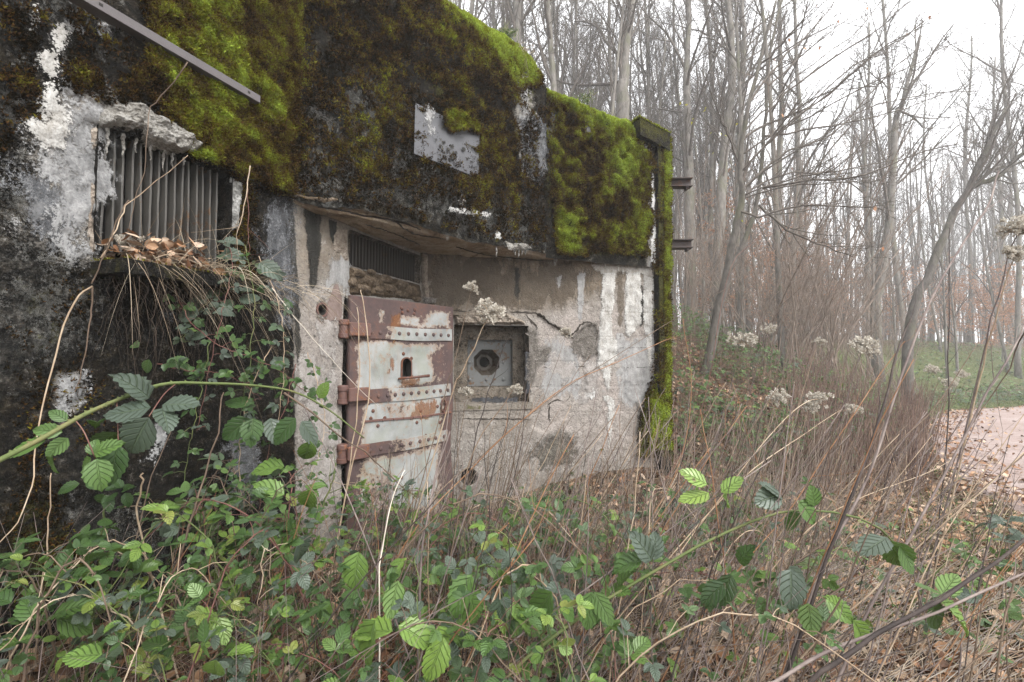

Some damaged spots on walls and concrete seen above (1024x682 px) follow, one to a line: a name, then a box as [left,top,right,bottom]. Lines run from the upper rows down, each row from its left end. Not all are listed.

peeling [0,65,120,269]
damp [256,196,353,363]
rust [389,358,420,388]
rust [411,399,437,420]
crack [463,395,570,430]
spalling [454,308,600,405]
damp [420,163,656,447]
crack [505,311,598,367]